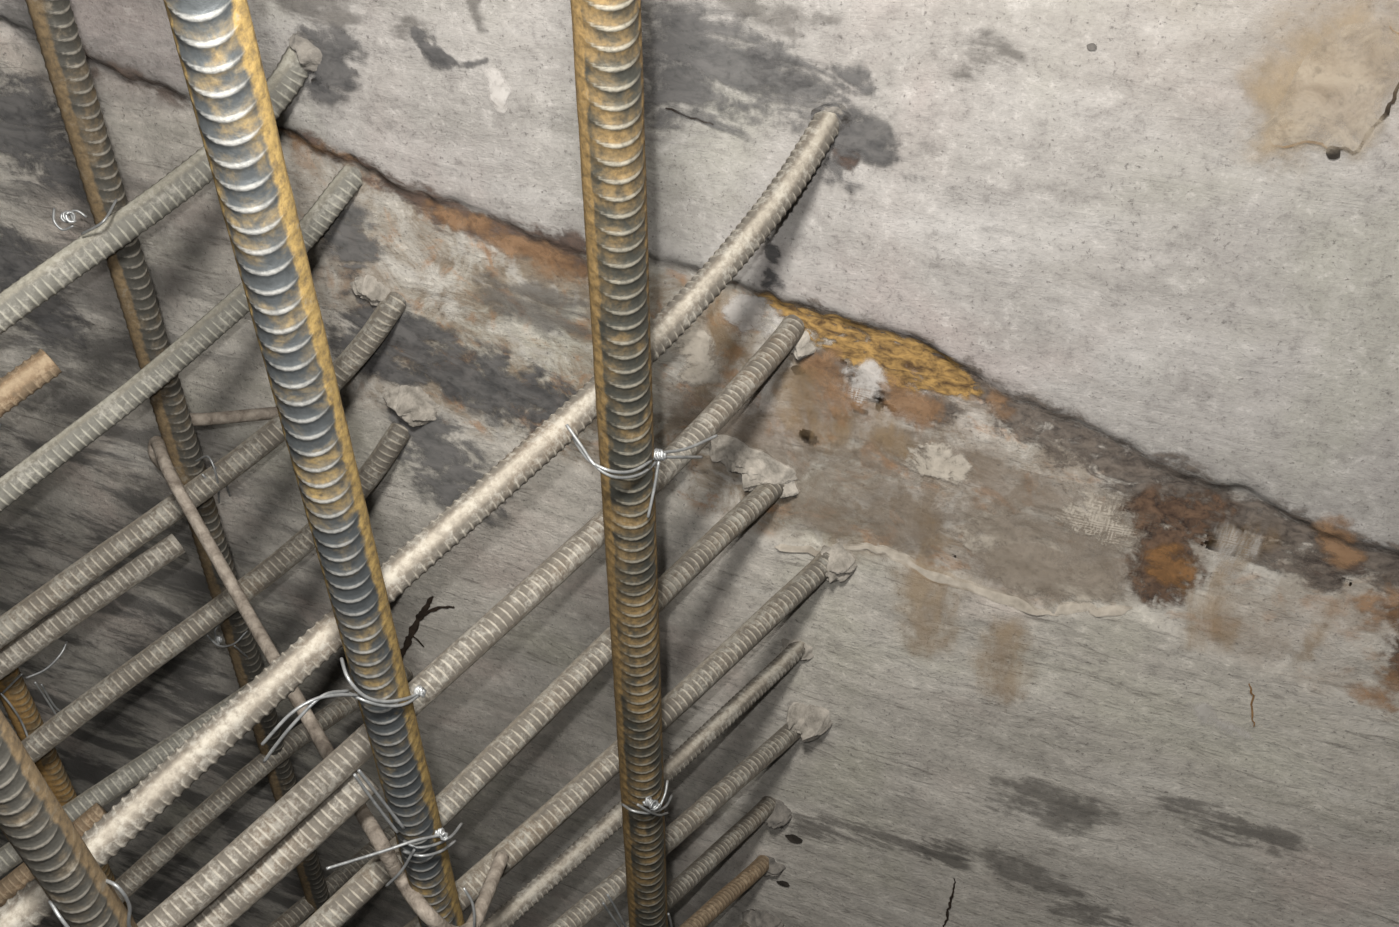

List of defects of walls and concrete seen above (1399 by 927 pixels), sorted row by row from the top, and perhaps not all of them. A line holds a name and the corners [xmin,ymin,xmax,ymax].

corrosion [277,127,588,277]
damp [641,0,900,190]
corrosion [833,148,860,170]
spalling [1326,149,1340,159]
crack [1272,82,1399,155]
peeling [843,361,889,403]
corrosion [755,292,1008,426]
spalling [0,0,852,927]
peeling [902,442,972,487]
peeling [832,508,1133,617]
corrosion [1119,486,1237,606]
crack [942,878,956,927]